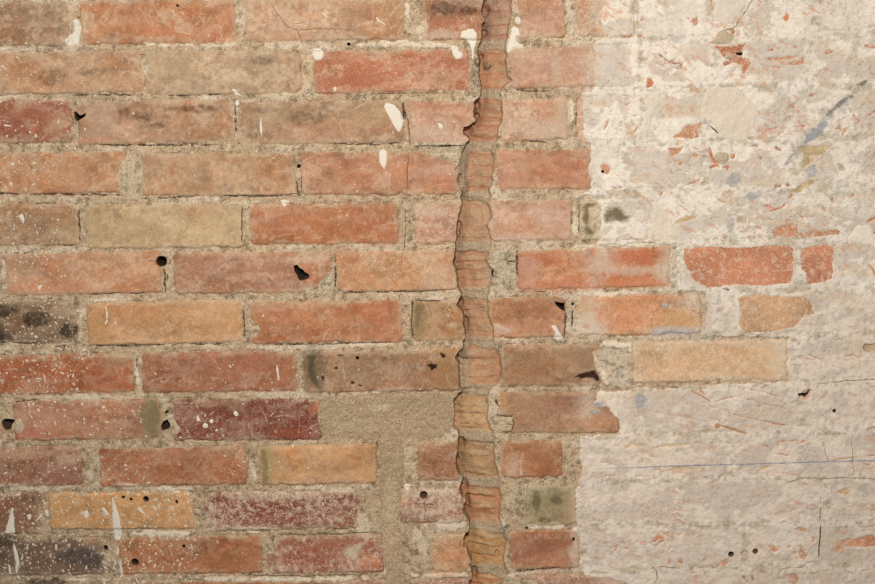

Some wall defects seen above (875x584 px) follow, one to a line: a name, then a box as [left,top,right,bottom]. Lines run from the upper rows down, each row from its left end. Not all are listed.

crack [269,2,347,47]
crack [275,339,386,347]
crack [334,0,559,584]
flaking render [572,0,875,584]